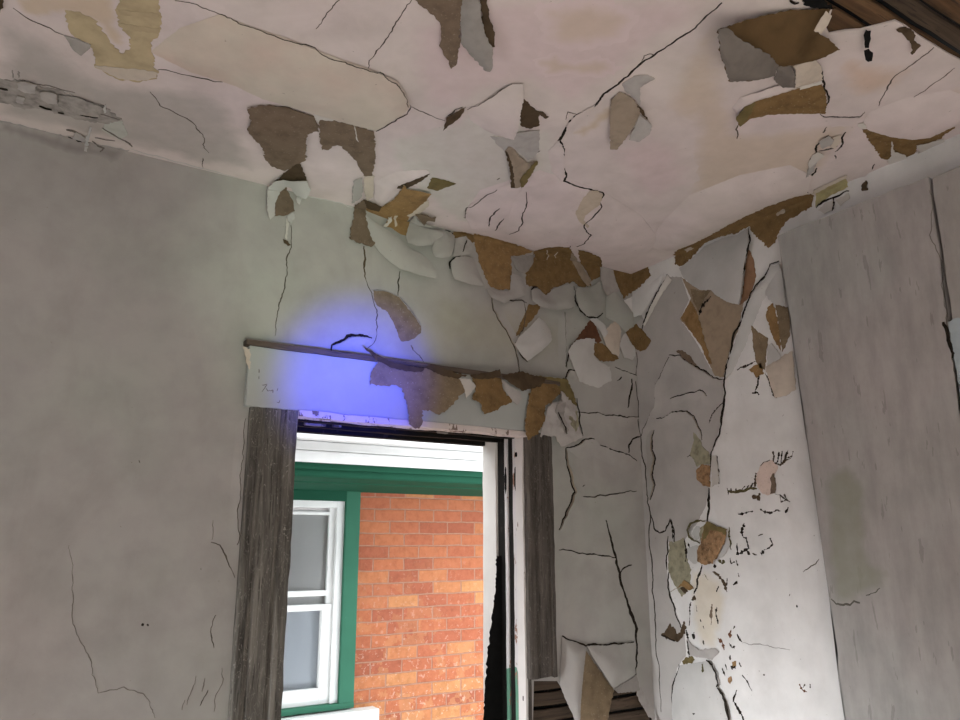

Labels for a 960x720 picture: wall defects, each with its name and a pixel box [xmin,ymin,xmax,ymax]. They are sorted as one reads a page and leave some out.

spalling [0,70,132,166]
peeling [247,105,456,279]
peeling [416,0,495,72]
crack [548,2,722,247]
peeling [717,0,840,138]
peeling [858,123,955,165]
crack [275,227,292,335]
crack [331,281,378,352]
peeling [364,75,850,720]
crack [559,228,780,699]
crack [68,547,155,717]
crack [706,660,752,720]